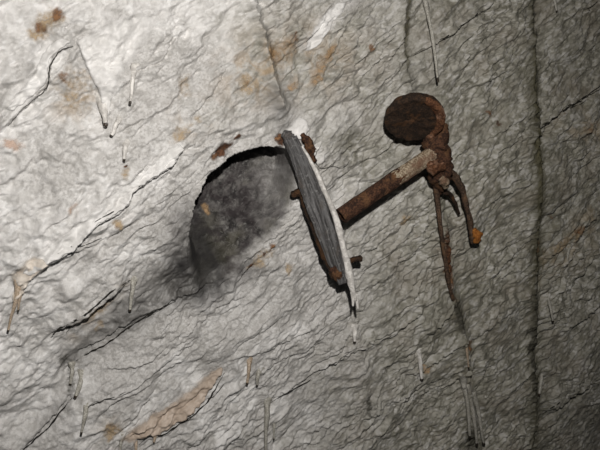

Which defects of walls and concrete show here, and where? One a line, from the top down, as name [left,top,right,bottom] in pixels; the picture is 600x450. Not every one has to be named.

corrosion [30,8,62,39]
crack [8,46,73,126]
corrosion [212,134,241,159]
corrosion [425,97,446,140]
crack [541,86,600,129]
spalling [187,146,299,286]
crack [50,280,131,338]
crack [76,301,176,361]